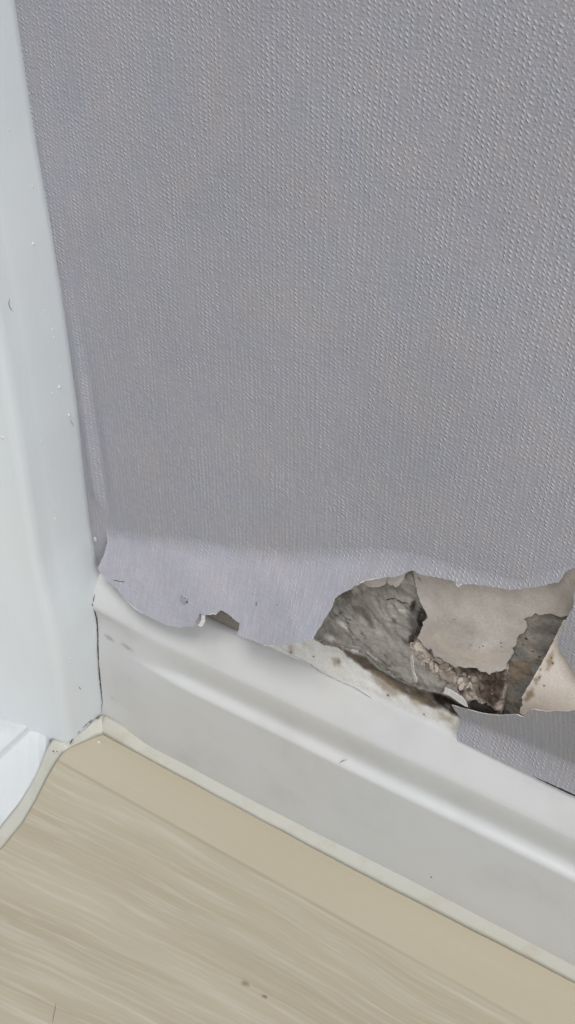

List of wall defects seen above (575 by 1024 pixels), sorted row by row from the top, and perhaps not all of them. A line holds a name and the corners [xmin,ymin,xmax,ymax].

spalling [270,571,575,732]